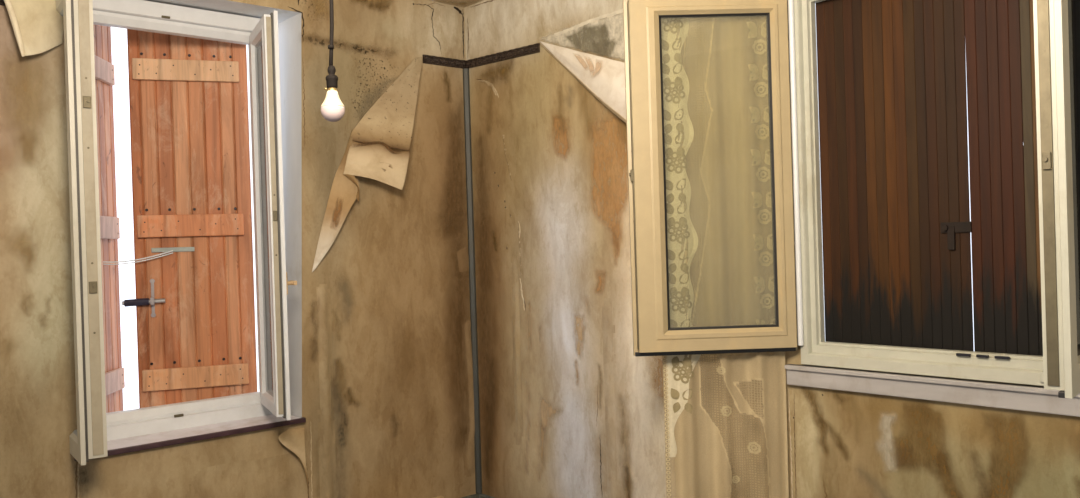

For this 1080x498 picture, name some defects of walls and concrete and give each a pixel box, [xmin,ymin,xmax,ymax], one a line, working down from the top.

peeling [541,8,624,60]
damp [592,103,628,248]
damp [804,389,845,453]
damp [896,405,961,498]
damp [987,417,1026,498]